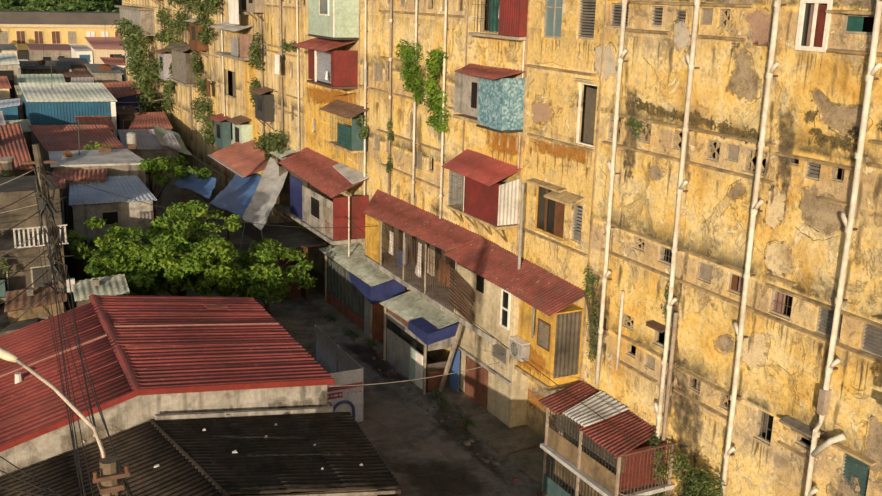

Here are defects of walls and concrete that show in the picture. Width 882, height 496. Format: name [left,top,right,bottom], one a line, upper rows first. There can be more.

peeling [832,0,876,11]
peeling [594,41,618,81]
peeling [673,19,690,54]
peeling [714,0,780,105]
rust [487,130,587,176]
peeling [532,101,555,125]
water stain [623,90,760,182]
peeling [808,88,873,140]
peeling [762,185,794,277]
peeling [799,186,855,235]
peeling [713,331,772,371]